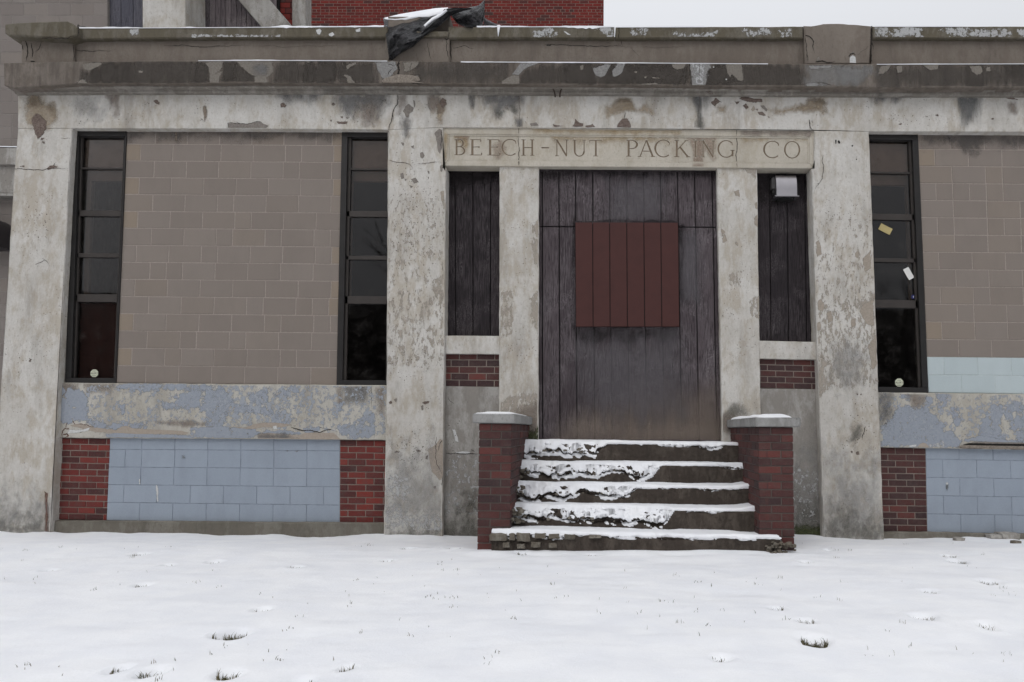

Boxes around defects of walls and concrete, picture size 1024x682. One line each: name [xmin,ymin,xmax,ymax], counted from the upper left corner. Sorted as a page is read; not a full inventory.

peeling [78,62,102,83]
peeling [206,61,222,83]
peeling [237,61,274,82]
spalling [375,61,422,83]
peeling [502,63,538,84]
peeling [580,63,657,85]
peeling [806,51,903,86]
peeling [672,64,769,118]
spalling [31,114,47,143]
peeling [400,97,425,158]
peeling [61,129,445,440]
peeling [814,196,1024,455]